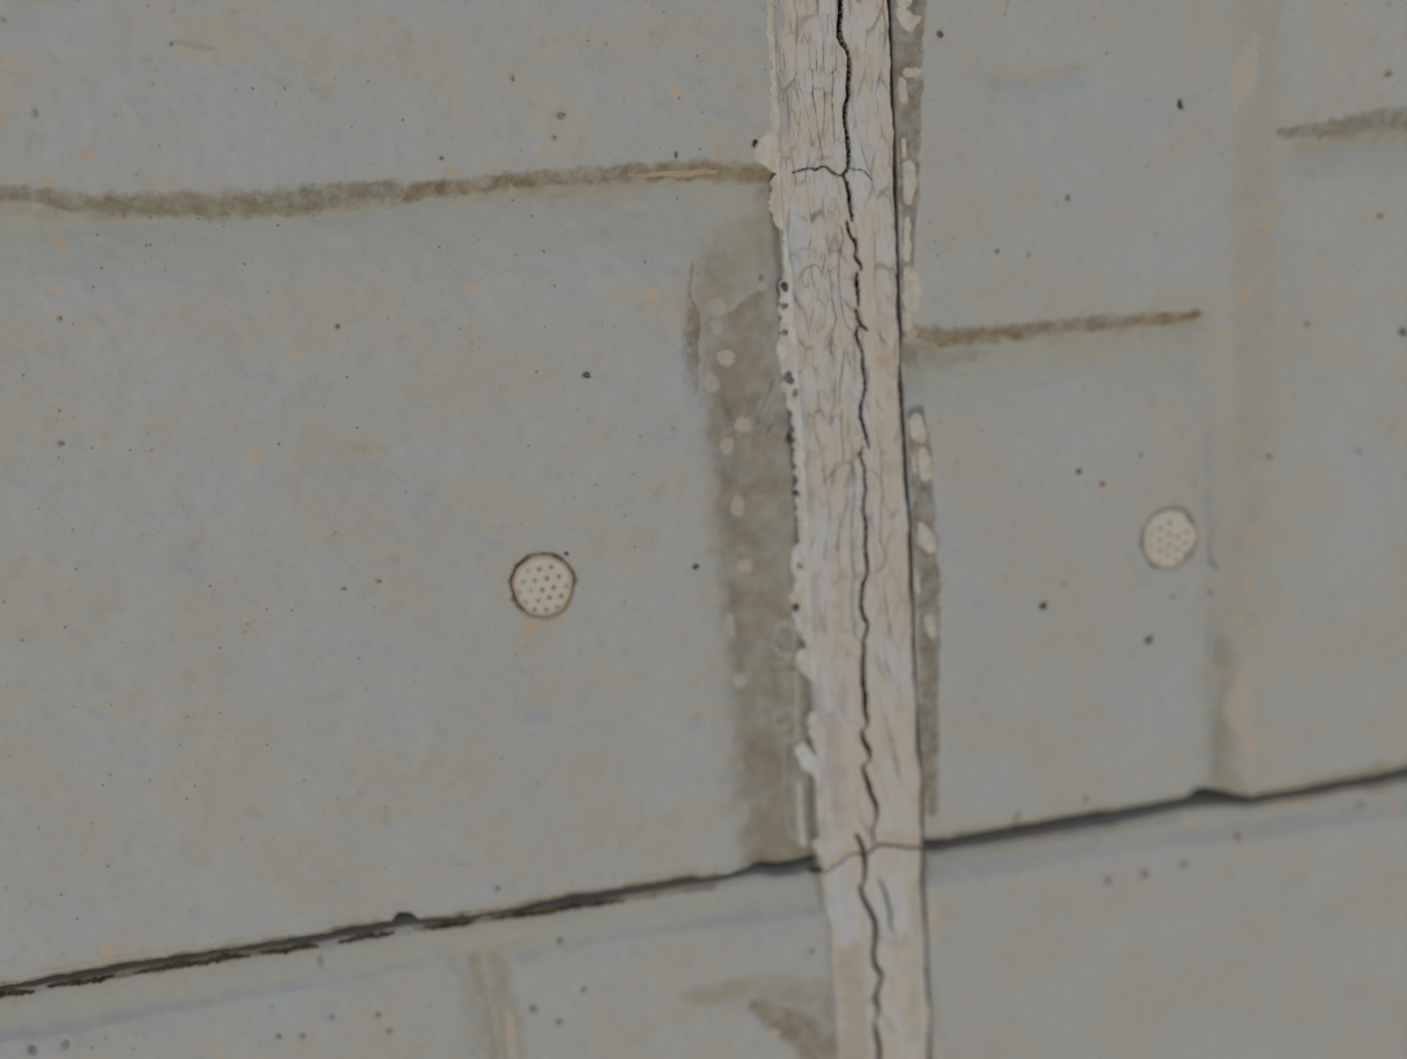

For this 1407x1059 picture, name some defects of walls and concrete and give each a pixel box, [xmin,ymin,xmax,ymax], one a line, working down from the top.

peeling [896,0,921,32]
peeling [897,67,922,103]
peeling [901,138,925,332]
peeling [907,413,934,482]
crack [783,0,931,1059]
peeling [917,523,937,554]